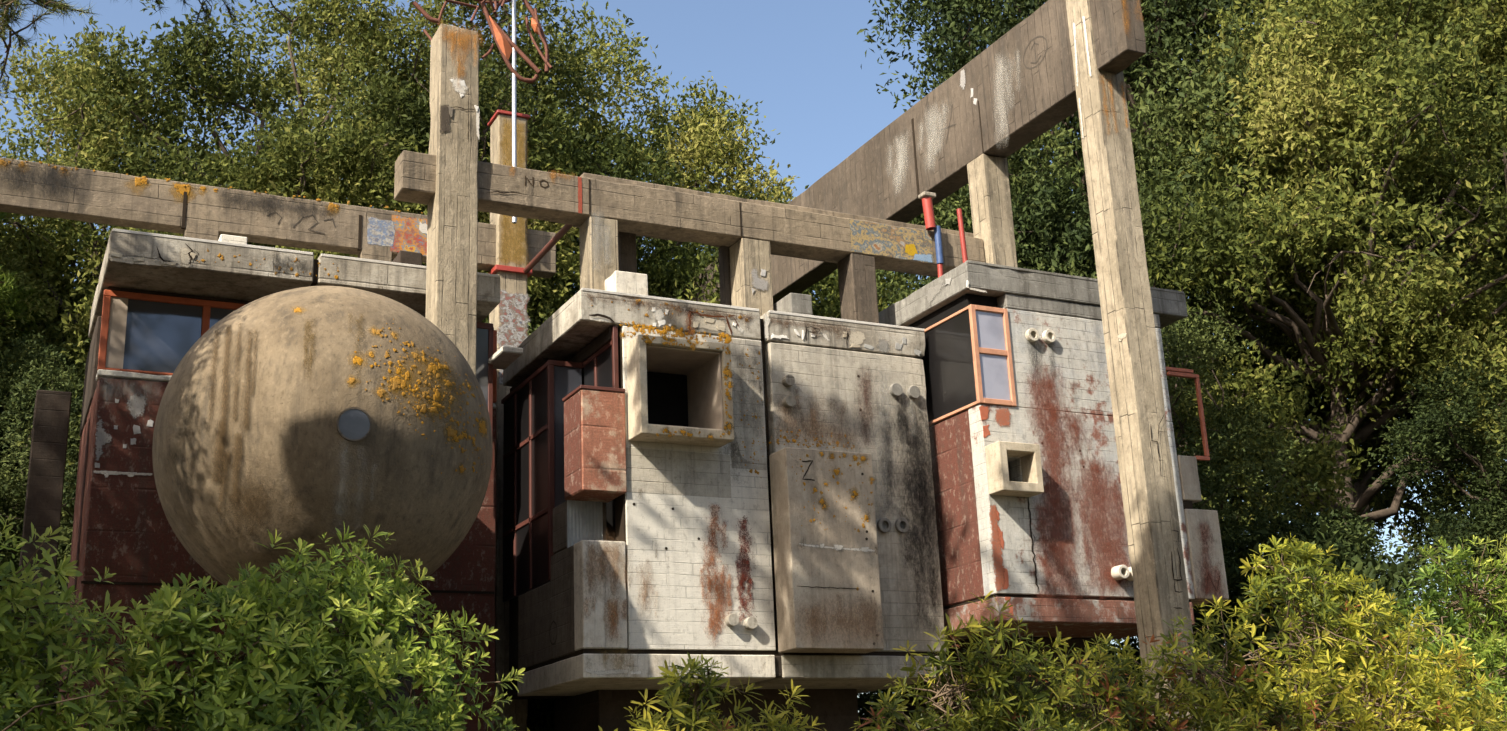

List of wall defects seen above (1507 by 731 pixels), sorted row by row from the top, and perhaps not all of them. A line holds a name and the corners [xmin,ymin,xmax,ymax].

rust [701,506,757,639]
leakage [799,543,875,552]
leakage [886,400,937,621]
rust [1030,377,1128,596]